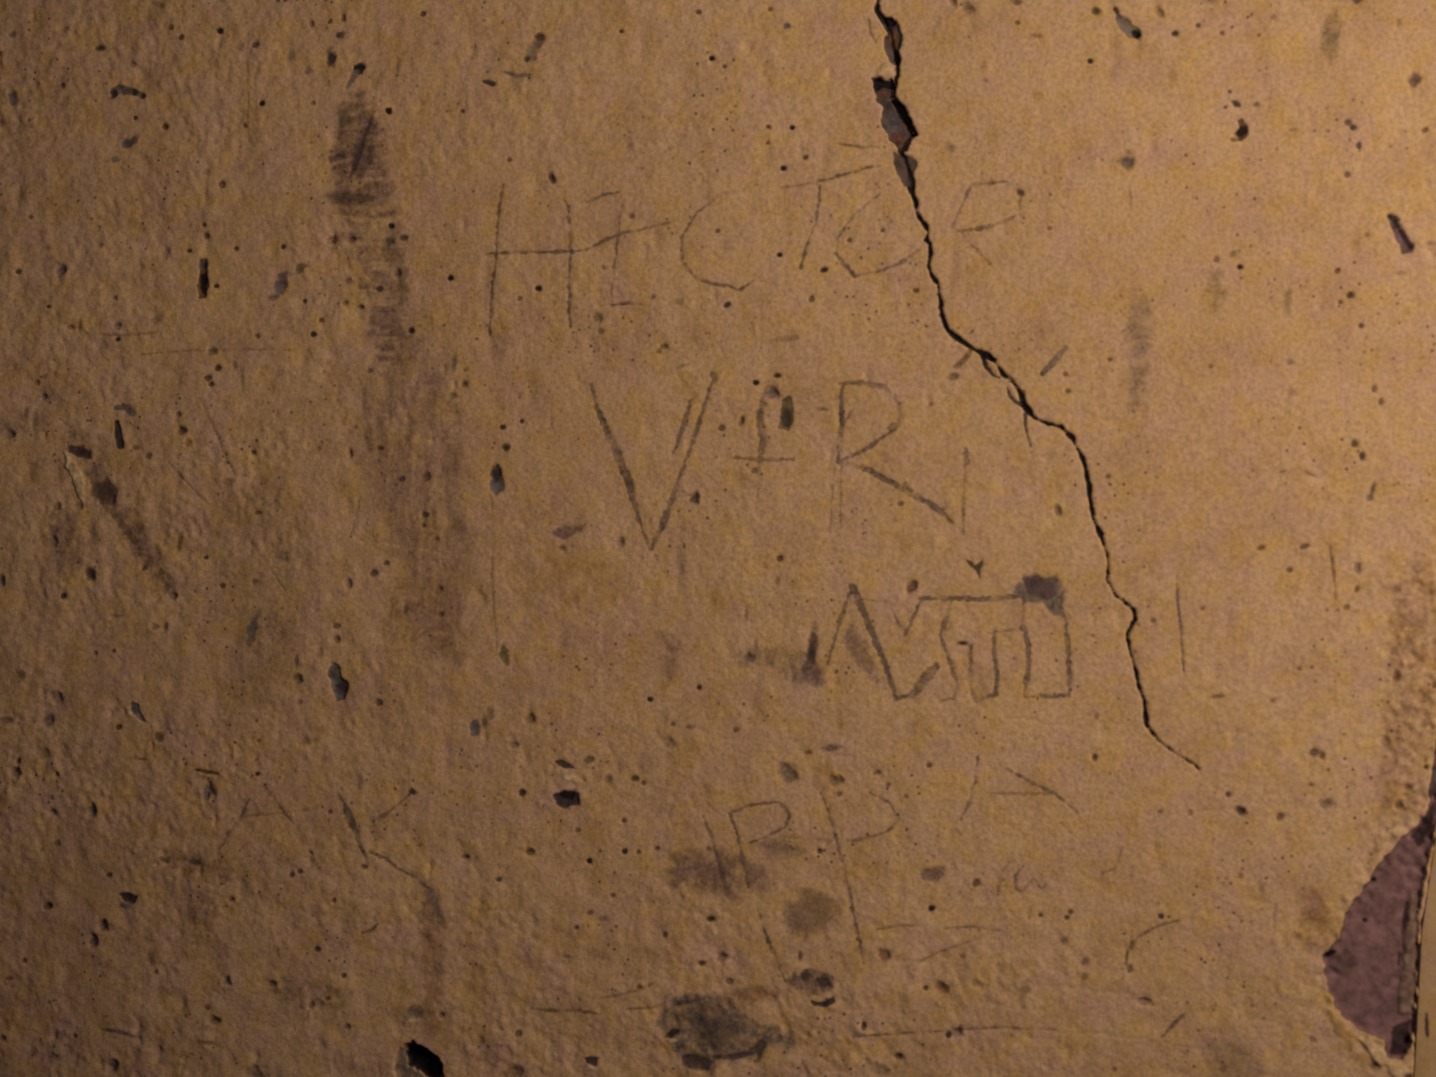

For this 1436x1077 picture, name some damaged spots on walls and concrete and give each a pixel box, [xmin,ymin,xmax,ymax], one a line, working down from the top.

crack [869,0,1200,770]
spalling [1322,794,1436,1077]